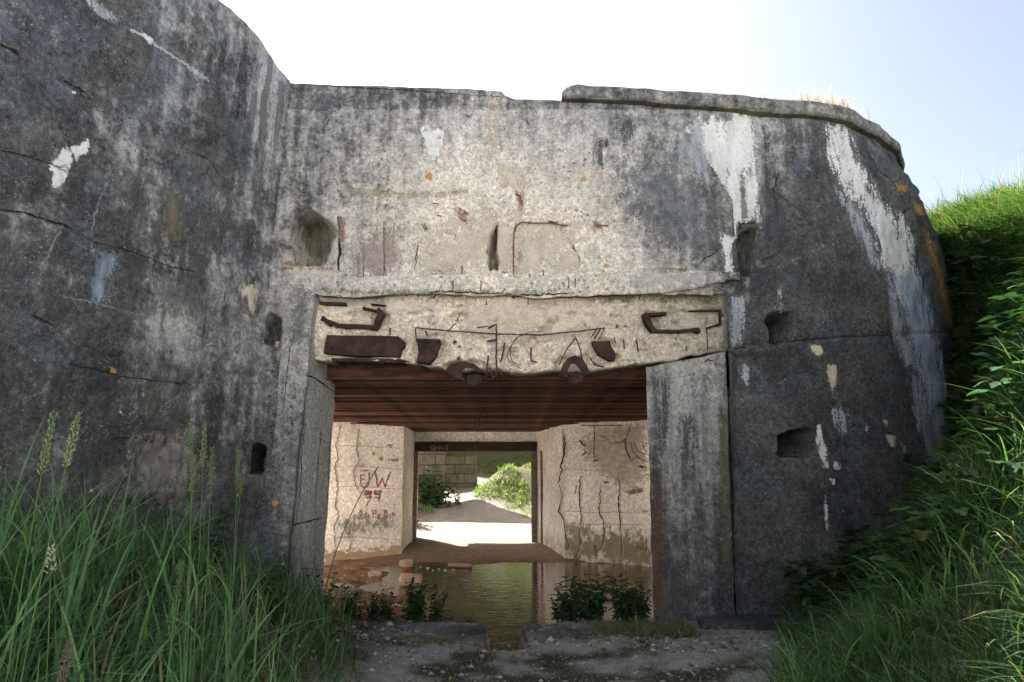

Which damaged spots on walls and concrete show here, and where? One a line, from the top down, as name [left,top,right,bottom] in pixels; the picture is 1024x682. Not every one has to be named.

peeling [70,138,90,161]
crack [1,210,196,272]
spalling [383,92,639,380]
water stain [593,113,785,287]
water stain [825,122,953,466]
crack [558,436,649,559]